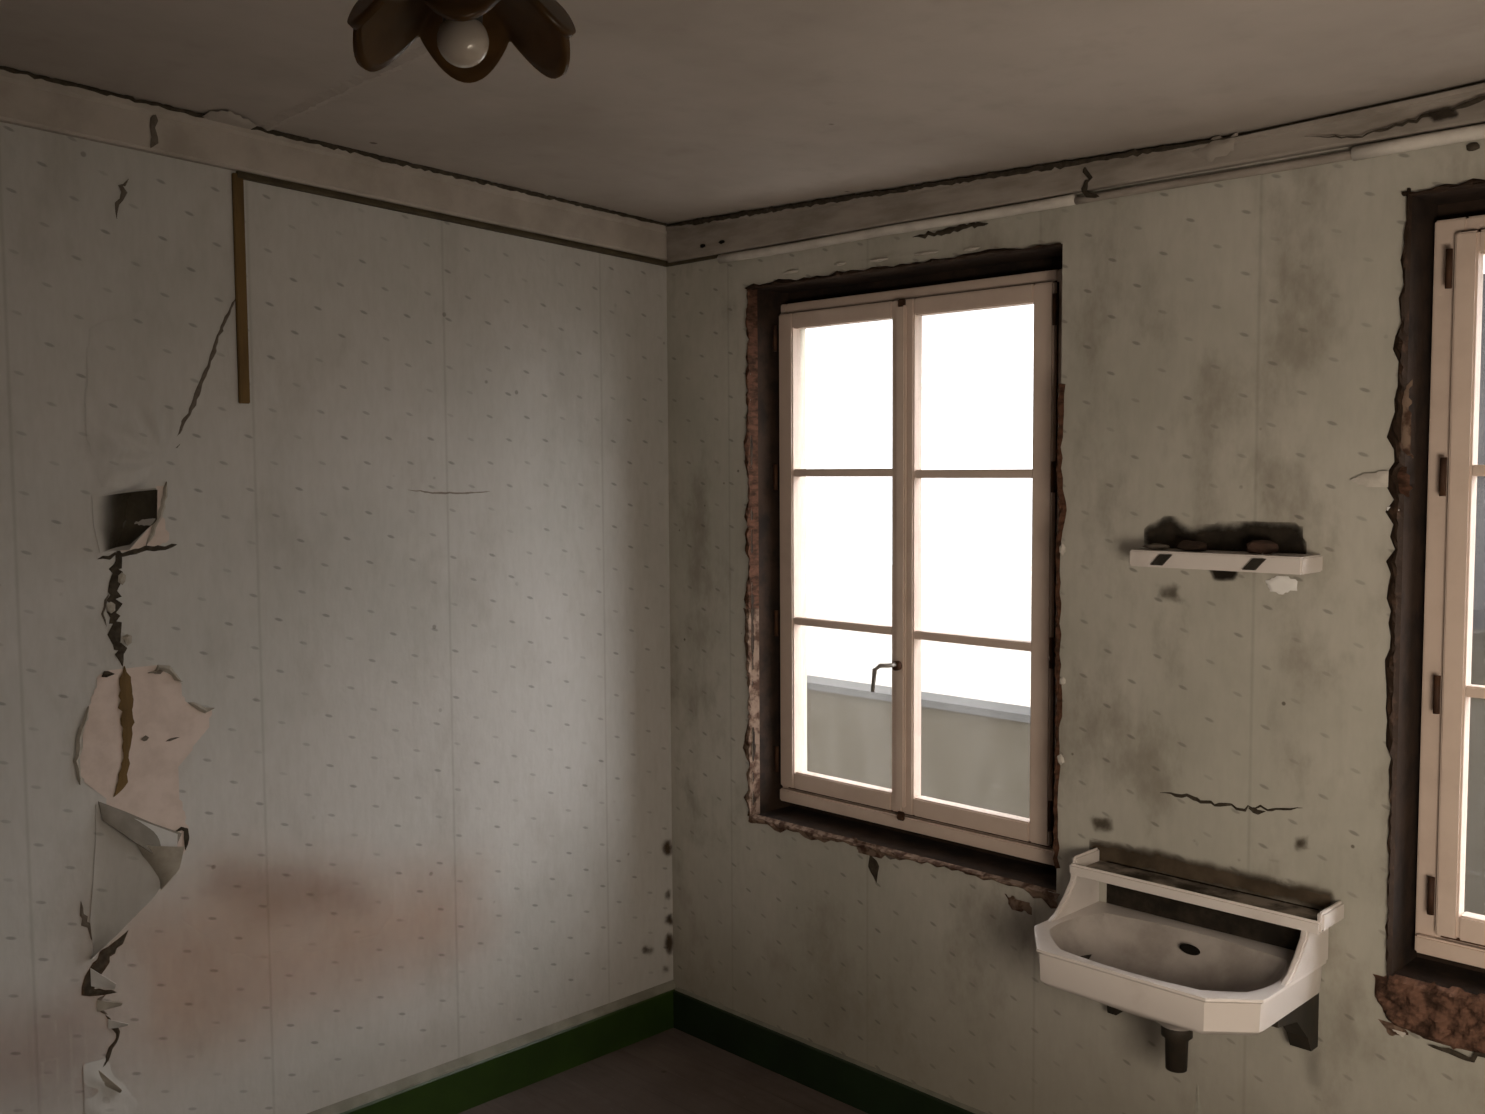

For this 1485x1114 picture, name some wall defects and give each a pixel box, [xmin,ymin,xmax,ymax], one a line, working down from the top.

crack [0,66,205,148]
crack [1305,96,1485,139]
crack [251,126,1251,227]
crack [914,222,988,239]
crack [98,544,177,666]
spalling [743,243,1063,915]
spalling [1053,384,1067,868]
spalling [1210,570,1237,580]
spalling [1144,517,1307,554]
spalling [1373,178,1485,1063]
peeling [73,664,214,960]
crack [1160,792,1298,815]